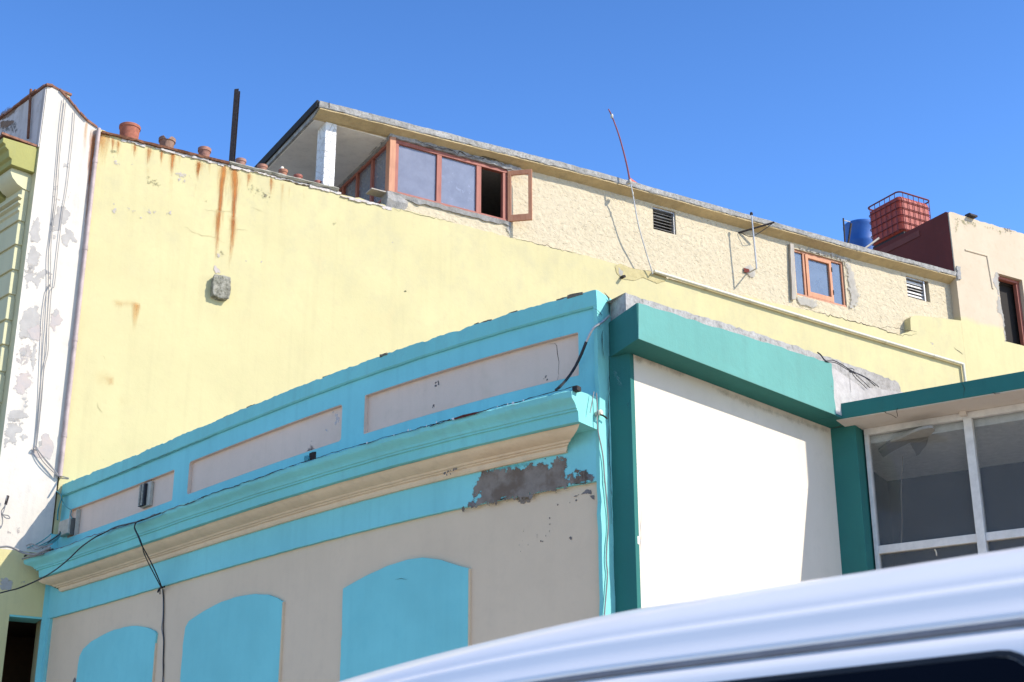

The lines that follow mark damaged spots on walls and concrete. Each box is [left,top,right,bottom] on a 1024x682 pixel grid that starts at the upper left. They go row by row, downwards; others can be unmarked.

rust [89,135,119,183]
peeling [24,186,77,289]
rust [217,167,249,240]
peeling [4,305,63,448]
peeling [461,456,594,514]